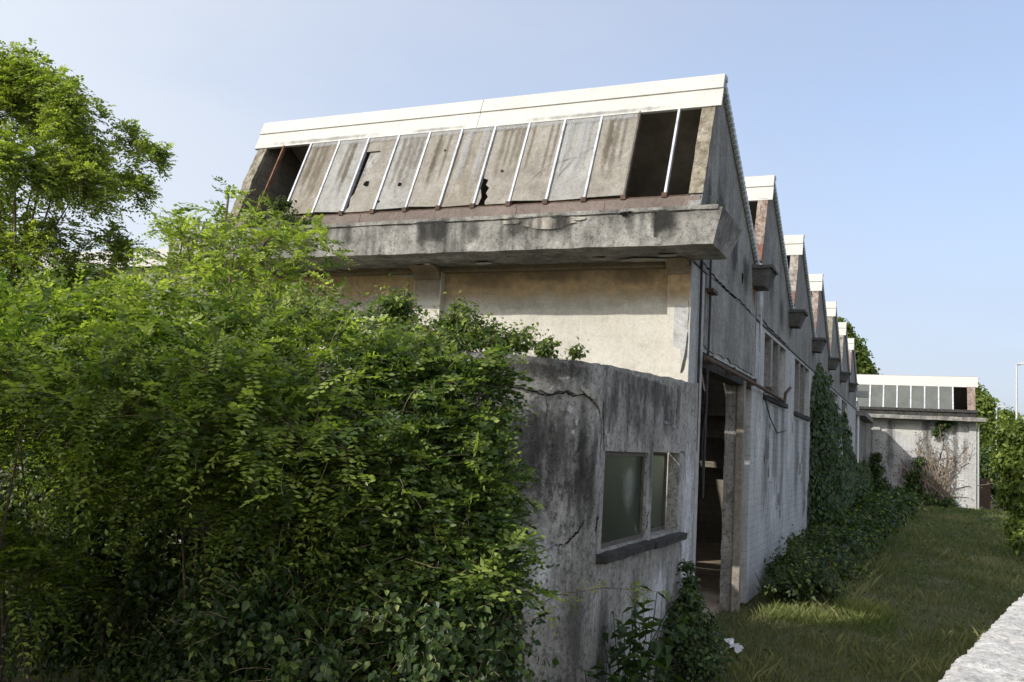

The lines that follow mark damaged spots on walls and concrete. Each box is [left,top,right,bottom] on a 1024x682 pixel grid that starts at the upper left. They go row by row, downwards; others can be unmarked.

water stain [312,113,638,169]
water stain [418,220,443,240]
water stain [552,215,570,231]
water stain [628,209,673,228]
crack [506,386,604,466]
water stain [577,433,597,492]
crack [547,516,599,550]
water stain [680,510,691,589]
water stain [516,541,550,619]
water stain [631,590,653,659]